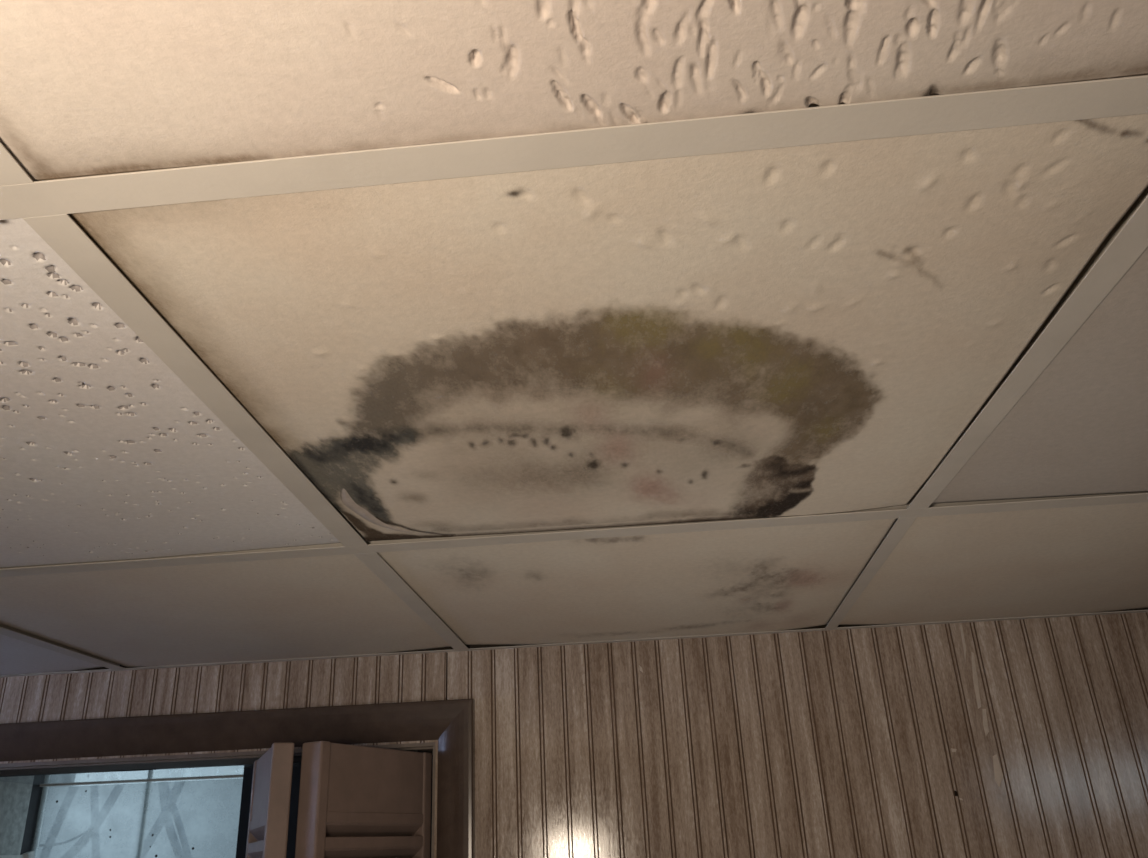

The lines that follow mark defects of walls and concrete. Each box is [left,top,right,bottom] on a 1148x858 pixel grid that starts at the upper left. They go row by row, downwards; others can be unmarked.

damp [68,213,167,320]
damp [179,334,254,416]
damp [265,312,879,541]